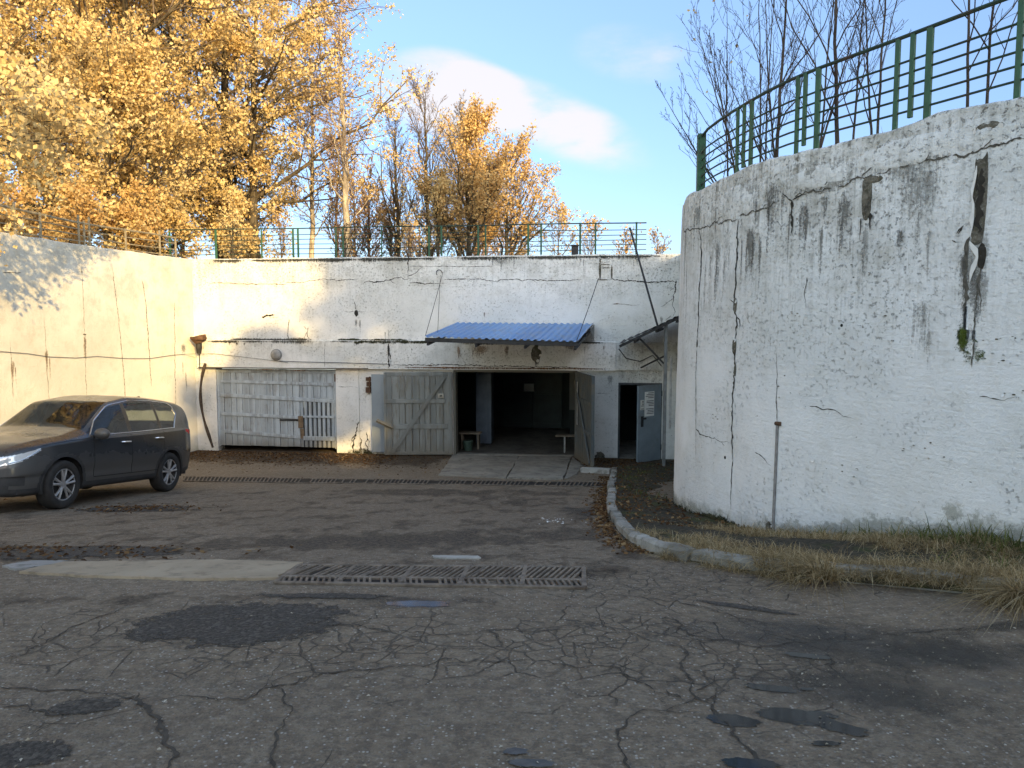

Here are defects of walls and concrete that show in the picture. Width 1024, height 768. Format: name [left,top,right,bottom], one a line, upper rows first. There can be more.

water stain [705,184,808,287]
water stain [823,194,852,247]
spalling [862,174,883,221]
spalling [969,152,988,282]
crack [209,257,581,312]
crack [612,137,1024,510]
spalling [531,345,543,363]